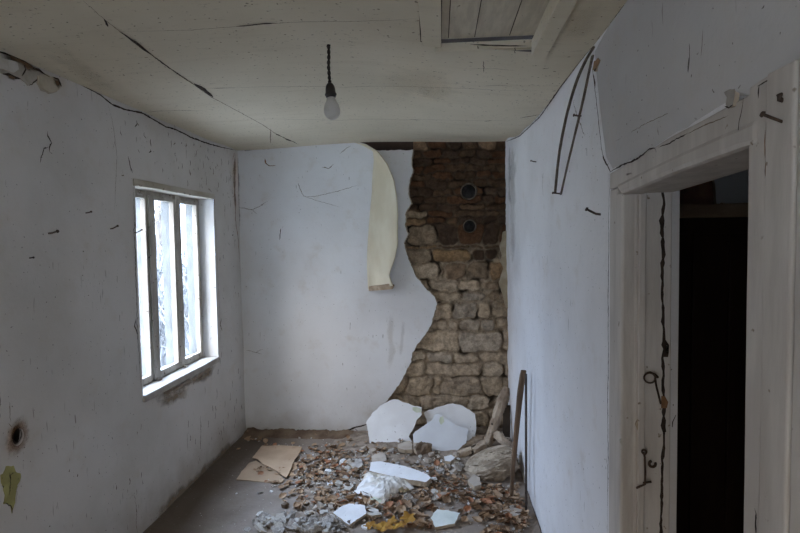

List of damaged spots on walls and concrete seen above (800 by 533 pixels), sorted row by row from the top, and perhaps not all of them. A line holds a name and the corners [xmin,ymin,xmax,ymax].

spalling [0,51,62,94]
crack [88,5,297,166]
crack [506,5,767,172]
water stain [163,367,211,404]
spalling [355,141,508,428]
crack [659,192,676,533]
peeling [0,466,22,513]